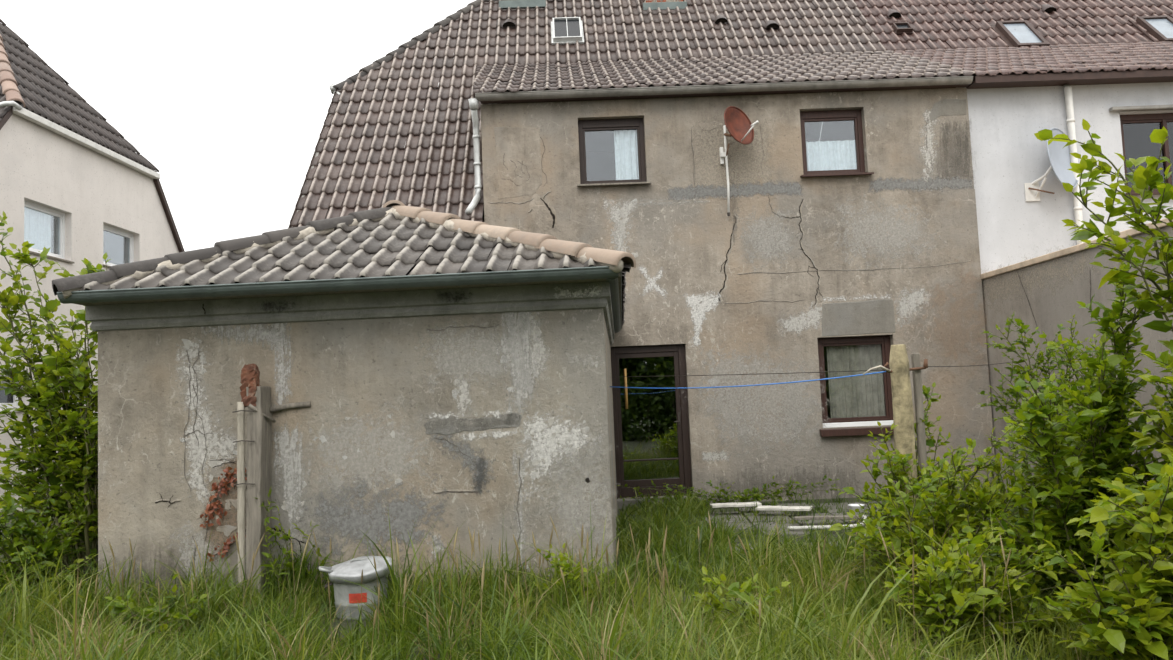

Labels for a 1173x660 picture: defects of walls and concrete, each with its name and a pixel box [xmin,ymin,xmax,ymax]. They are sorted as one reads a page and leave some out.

crack [718,214,738,302]
crack [760,127,822,308]
peeling [686,291,721,347]
peeling [452,379,472,414]
peeling [177,339,247,547]
peeling [517,412,601,497]